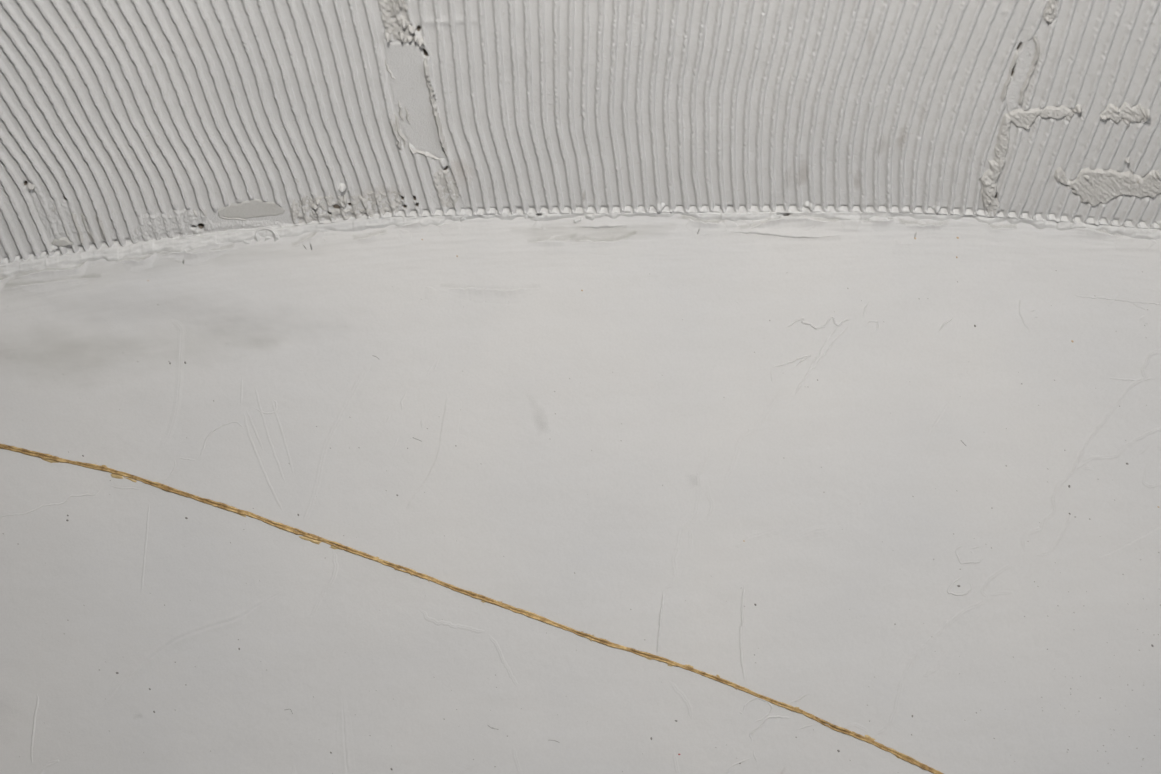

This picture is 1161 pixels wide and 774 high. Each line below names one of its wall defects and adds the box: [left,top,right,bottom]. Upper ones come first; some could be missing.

peeling [1000,37,1041,105]